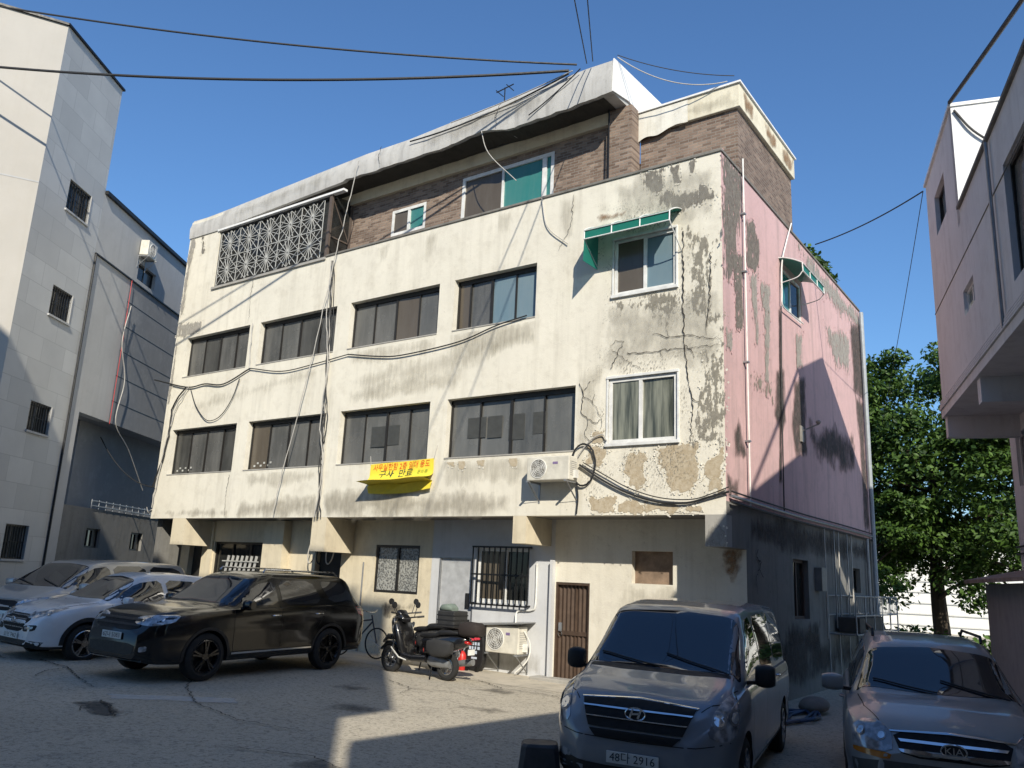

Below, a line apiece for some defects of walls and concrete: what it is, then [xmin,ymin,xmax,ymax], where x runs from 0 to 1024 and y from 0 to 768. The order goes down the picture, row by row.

peeling [640,148,775,405]
crack [610,231,720,442]
peeling [826,327,850,375]
crack [579,383,602,442]
peeling [582,397,730,517]
damp [752,519,870,557]
damp [783,625,861,685]